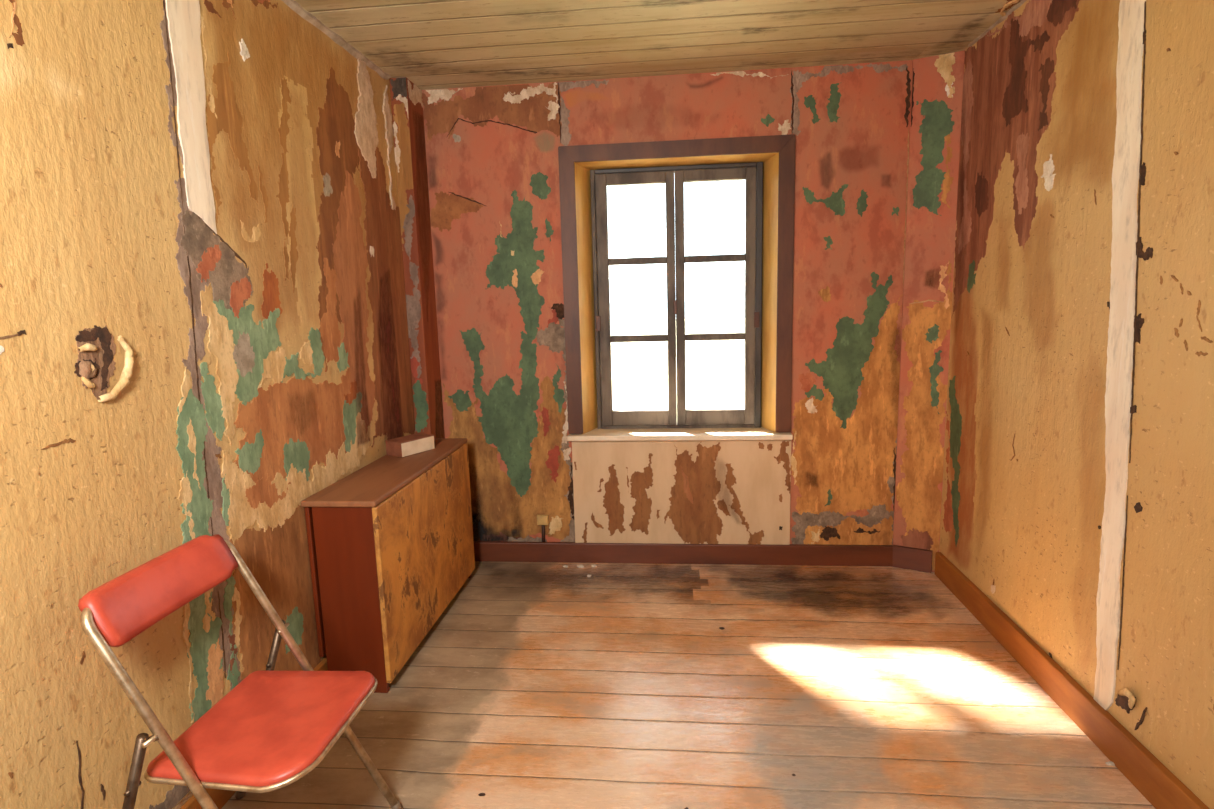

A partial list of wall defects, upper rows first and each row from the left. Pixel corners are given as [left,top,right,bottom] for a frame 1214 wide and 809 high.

hole [74,325,135,402]
peeling [165,0,349,544]
peeling [343,392,362,452]
peeling [382,79,764,544]
peeling [758,431,798,502]
flaking render [779,438,933,550]
peeling [790,0,1080,429]
peeling [925,324,962,546]
flaking render [1093,0,1146,710]
peeling [1160,275,1213,356]
peeling [182,575,242,723]
peeling [458,561,975,633]